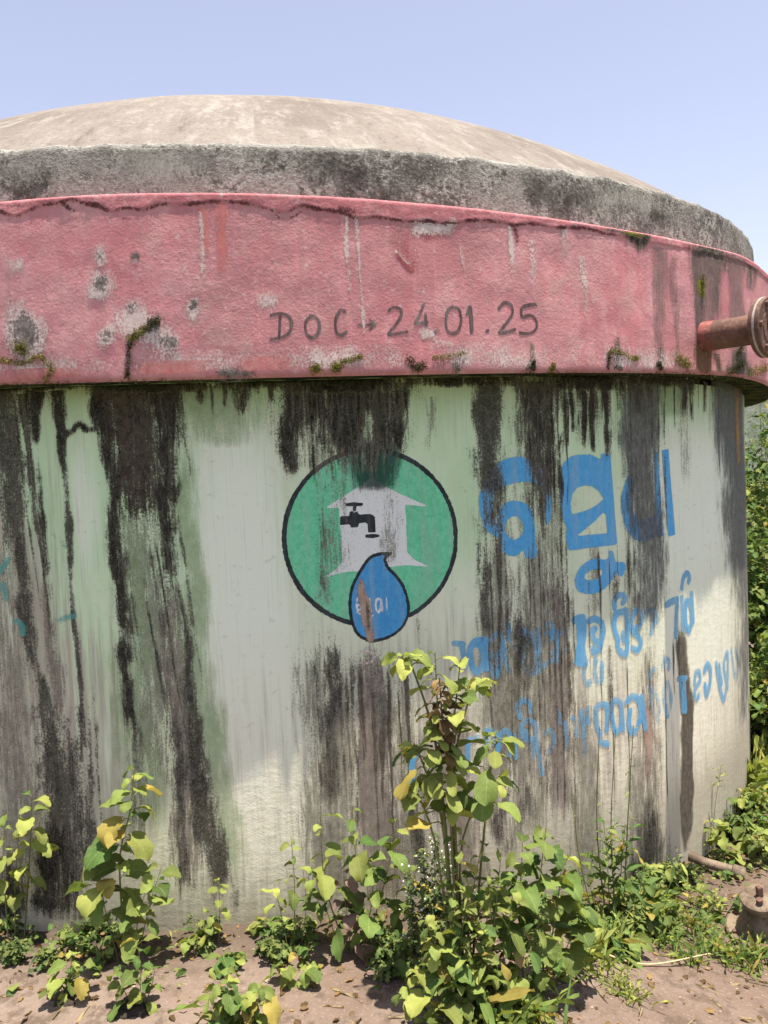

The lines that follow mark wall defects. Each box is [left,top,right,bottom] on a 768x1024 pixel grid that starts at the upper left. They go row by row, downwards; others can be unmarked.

peeling [86,245,116,300]
peeling [2,297,76,380]
peeling [96,297,202,374]
leakage [0,205,758,921]